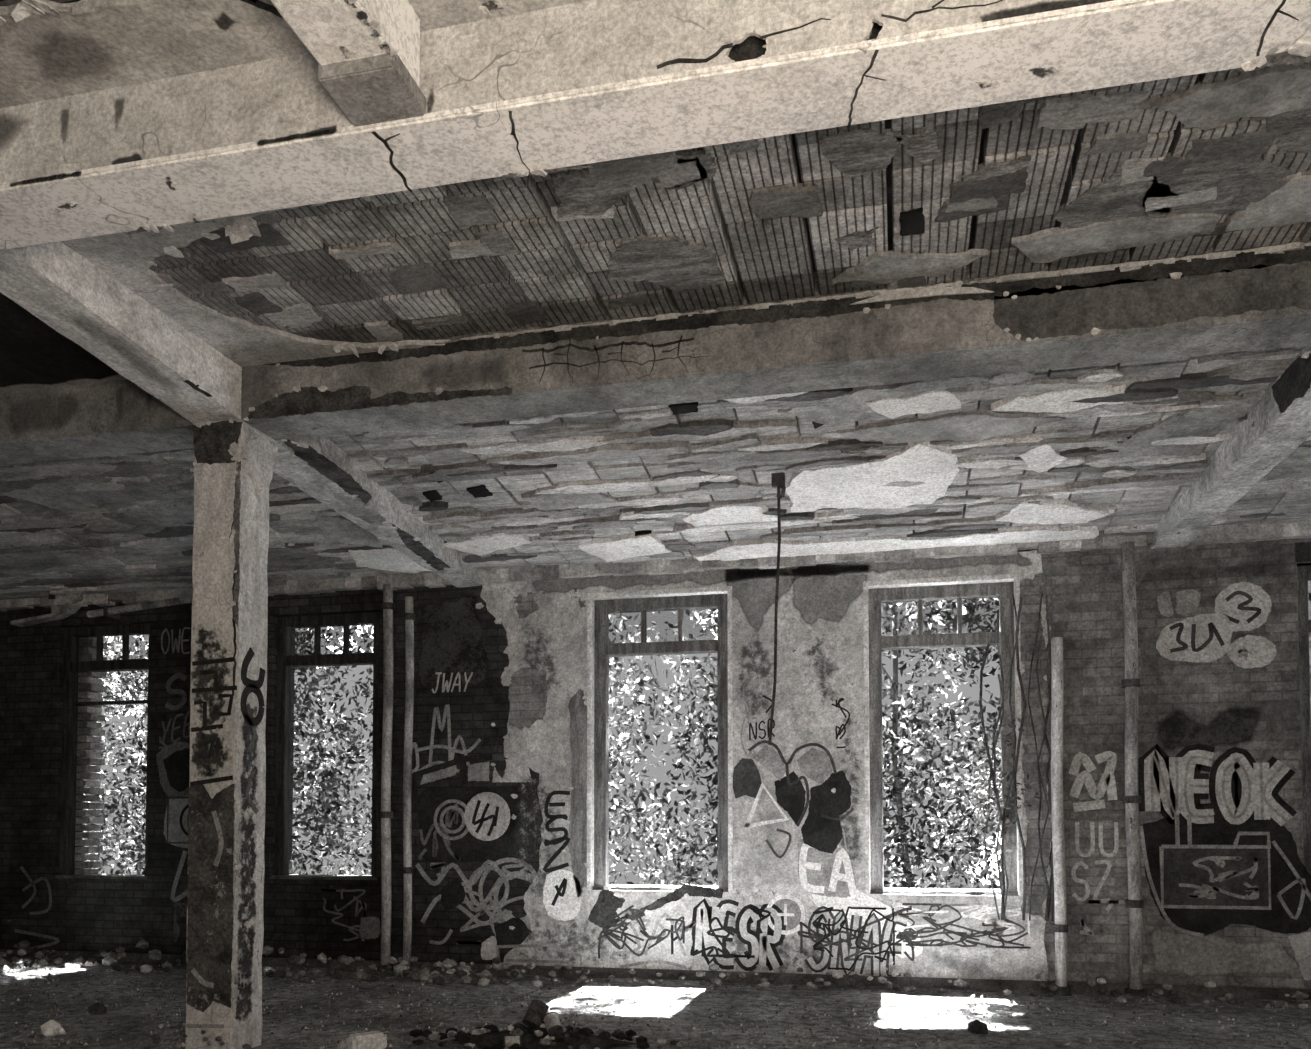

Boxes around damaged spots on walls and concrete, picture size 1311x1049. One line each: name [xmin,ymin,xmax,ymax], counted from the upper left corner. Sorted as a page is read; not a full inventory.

flaking render [0,0,95,26]
peeling [344,0,399,56]
peeling [479,0,509,15]
crack [657,18,831,69]
crack [881,0,1003,22]
crack [847,50,886,128]
crack [371,131,412,192]
flaking render [115,41,1311,367]
flaking render [0,346,1311,626]